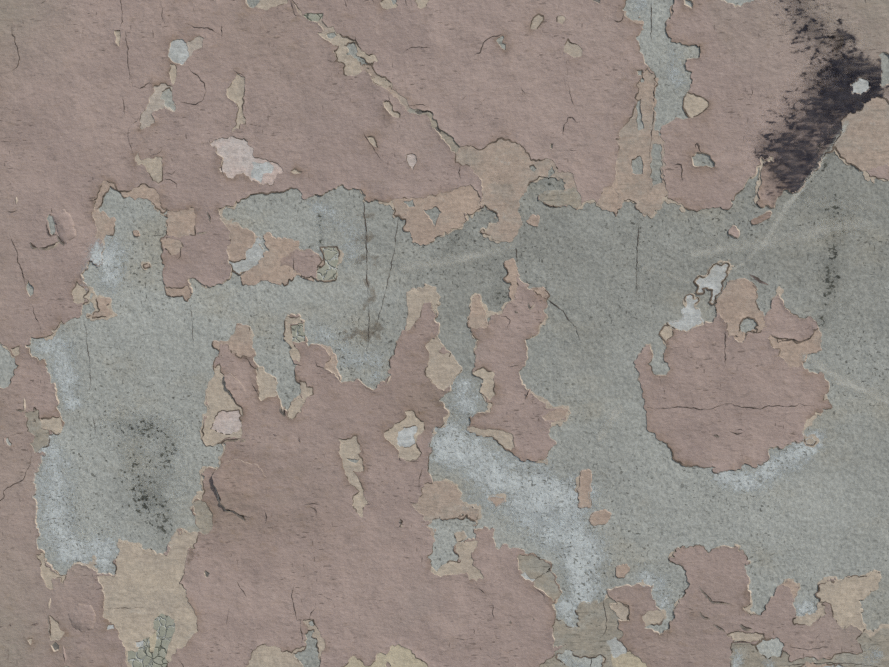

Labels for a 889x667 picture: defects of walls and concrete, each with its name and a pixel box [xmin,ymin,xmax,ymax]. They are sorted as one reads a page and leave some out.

leakage [758,1,889,195]
peeling [851,78,869,94]
peeling [832,97,889,171]
flaking render [879,52,889,87]
peeling [715,278,767,342]
crack [650,376,807,410]
leakage [113,412,176,539]
peeling [339,435,368,517]
leakage [429,376,611,627]
peeling [97,532,198,667]
flaking render [412,442,647,667]
peeling [726,570,889,667]